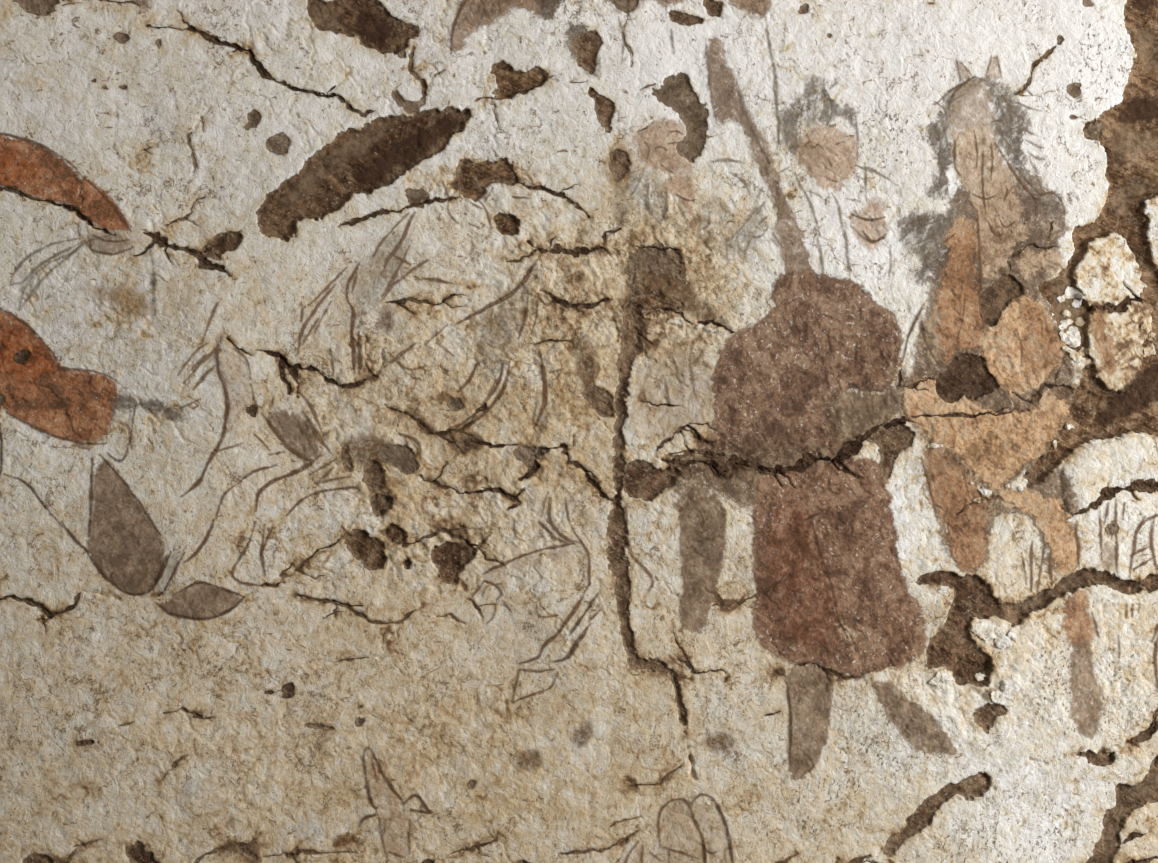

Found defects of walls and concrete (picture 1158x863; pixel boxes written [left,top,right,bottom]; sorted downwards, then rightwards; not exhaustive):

crack [62,0,376,118]
spalling [256,90,471,242]
crack [338,179,458,228]
crack [506,181,679,263]
spalling [652,72,709,163]
flaking render [1006,0,1158,491]
crack [227,337,377,398]
crack [384,290,1068,727]
crack [262,538,496,662]
flaking render [916,568,1158,734]
spalling [884,772,991,857]
flaking render [1085,756,1158,863]